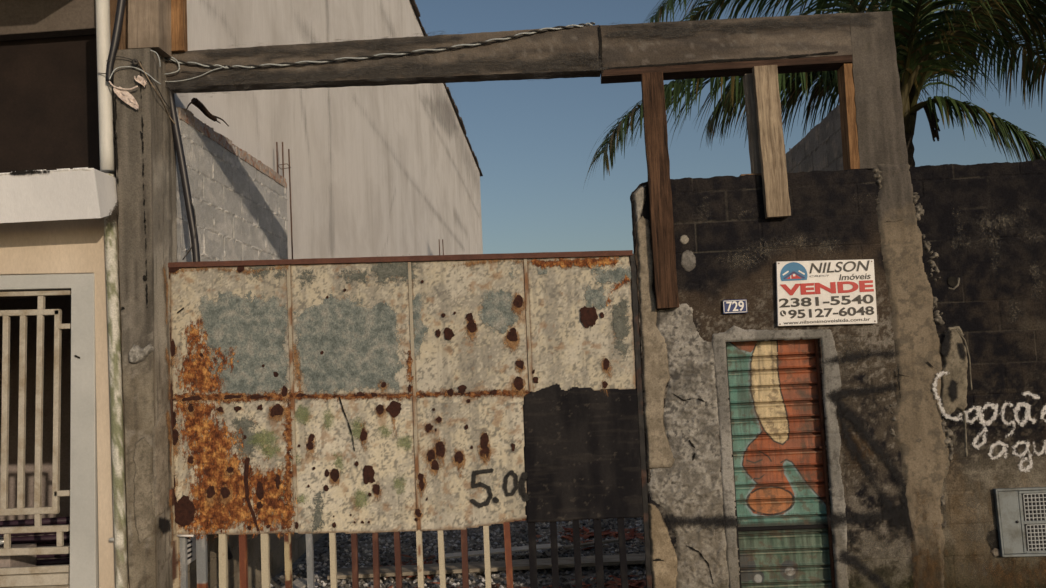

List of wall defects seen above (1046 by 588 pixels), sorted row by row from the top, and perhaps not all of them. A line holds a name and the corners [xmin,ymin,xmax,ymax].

rust [453,256,619,269]
rust [580,275,630,328]
rust [600,358,612,395]
rust [166,293,538,579]